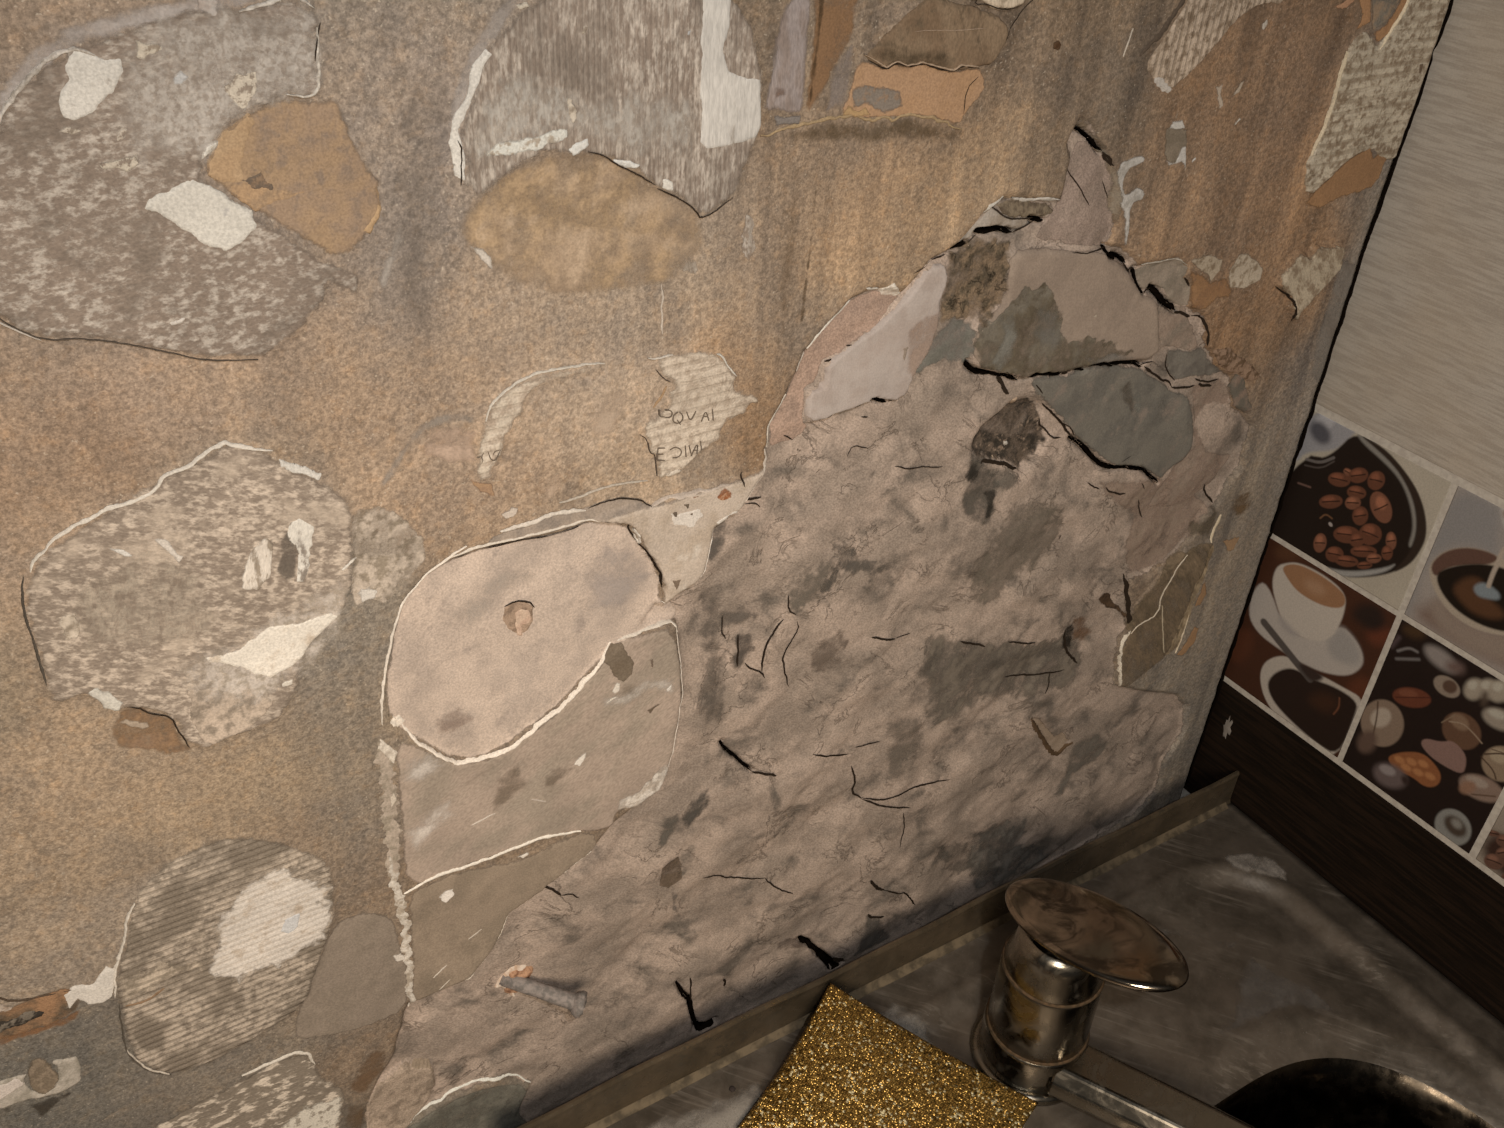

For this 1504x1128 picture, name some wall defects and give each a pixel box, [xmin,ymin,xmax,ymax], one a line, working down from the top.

peeling [59,41,162,135]
peeling [843,0,1033,123]
peeling [145,180,257,251]
crack [828,397,940,470]
peeling [242,519,314,590]
peeling [187,613,340,744]
crack [721,596,799,687]
flaking render [353,120,1263,1128]
crack [718,740,776,777]
crack [813,741,950,846]
crack [786,935,844,970]
crack [675,978,726,1031]